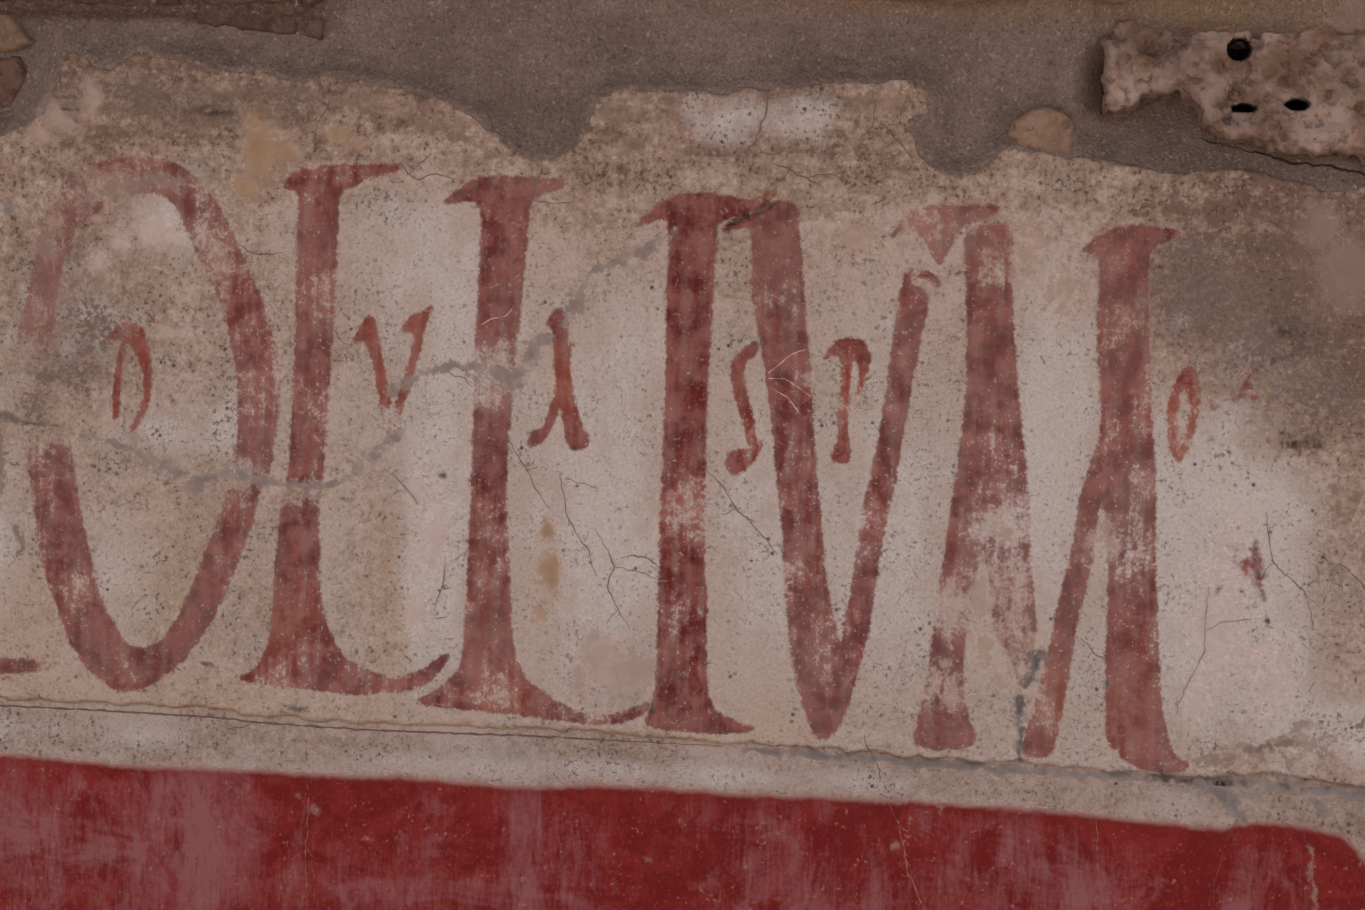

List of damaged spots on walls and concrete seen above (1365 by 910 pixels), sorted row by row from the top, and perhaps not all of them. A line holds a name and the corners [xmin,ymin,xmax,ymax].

crack [0,235,672,505]
crack [434,558,450,619]
crack [504,432,660,625]